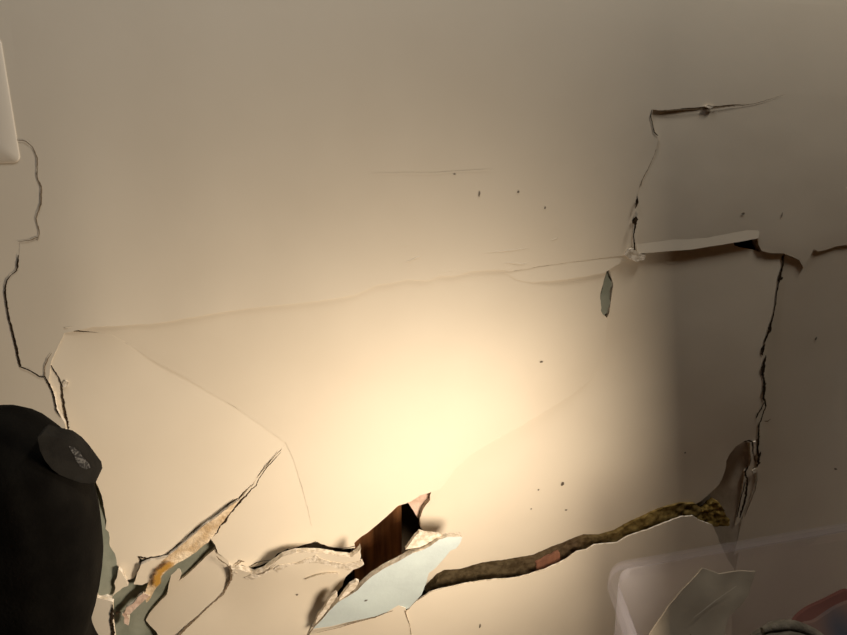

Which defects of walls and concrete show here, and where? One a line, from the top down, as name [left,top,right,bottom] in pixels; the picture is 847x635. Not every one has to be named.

crack [632,95,782,250]
crack [4,140,69,429]
peeling [502,230,759,315]
crack [737,255,784,518]
peeling [95,482,239,635]
crack [178,452,364,635]
spalling [291,542,351,553]
peeling [306,572,359,626]
spalling [401,493,443,554]
spalling [696,441,756,571]